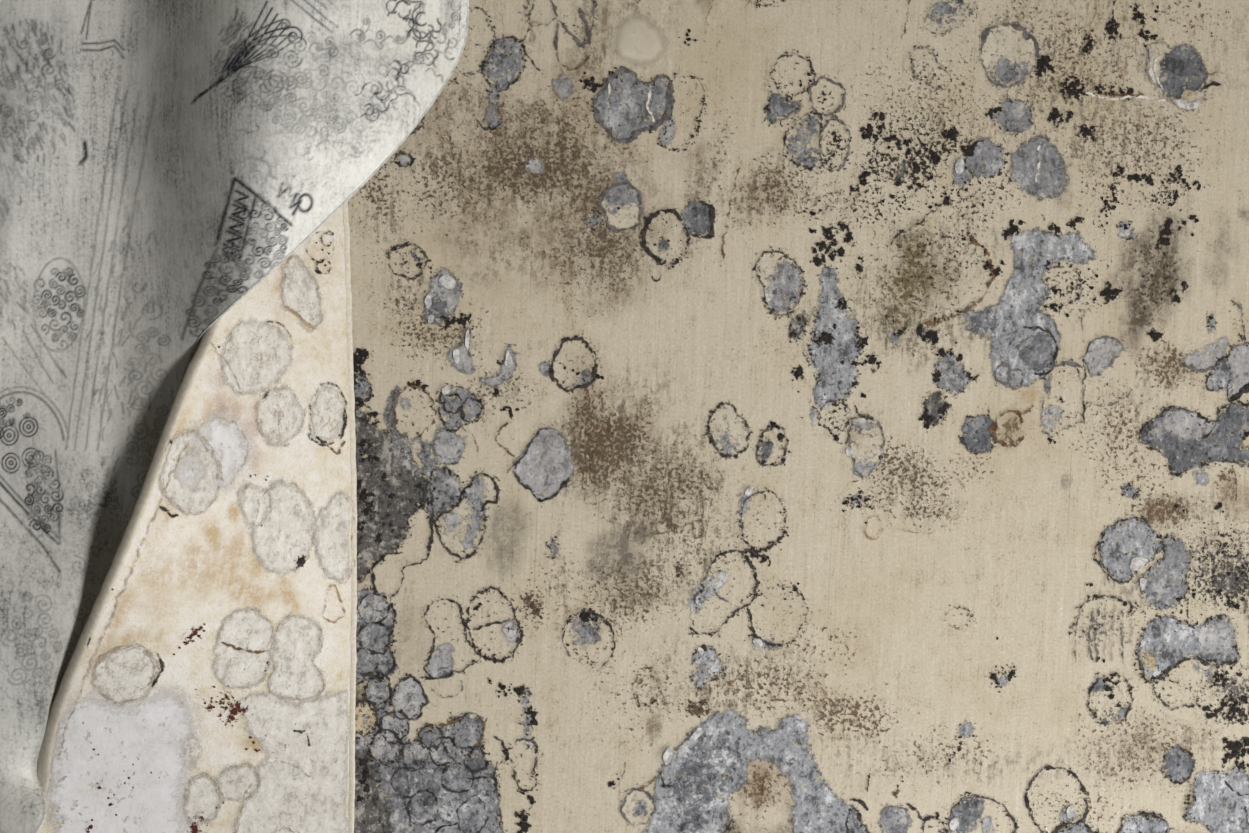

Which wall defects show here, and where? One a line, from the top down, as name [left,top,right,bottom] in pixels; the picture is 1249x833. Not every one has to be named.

damp [351,67,665,422]
peeling [749,246,863,412]
damp [684,0,1249,631]
peeling [918,216,1096,430]
peeling [1135,340,1249,486]
peeling [45,256,574,833]
damp [510,346,1002,785]
peeling [1093,482,1249,684]
damp [196,686,253,727]
damp [515,771,539,833]
peeling [620,706,913,833]
damp [1063,666,1249,833]